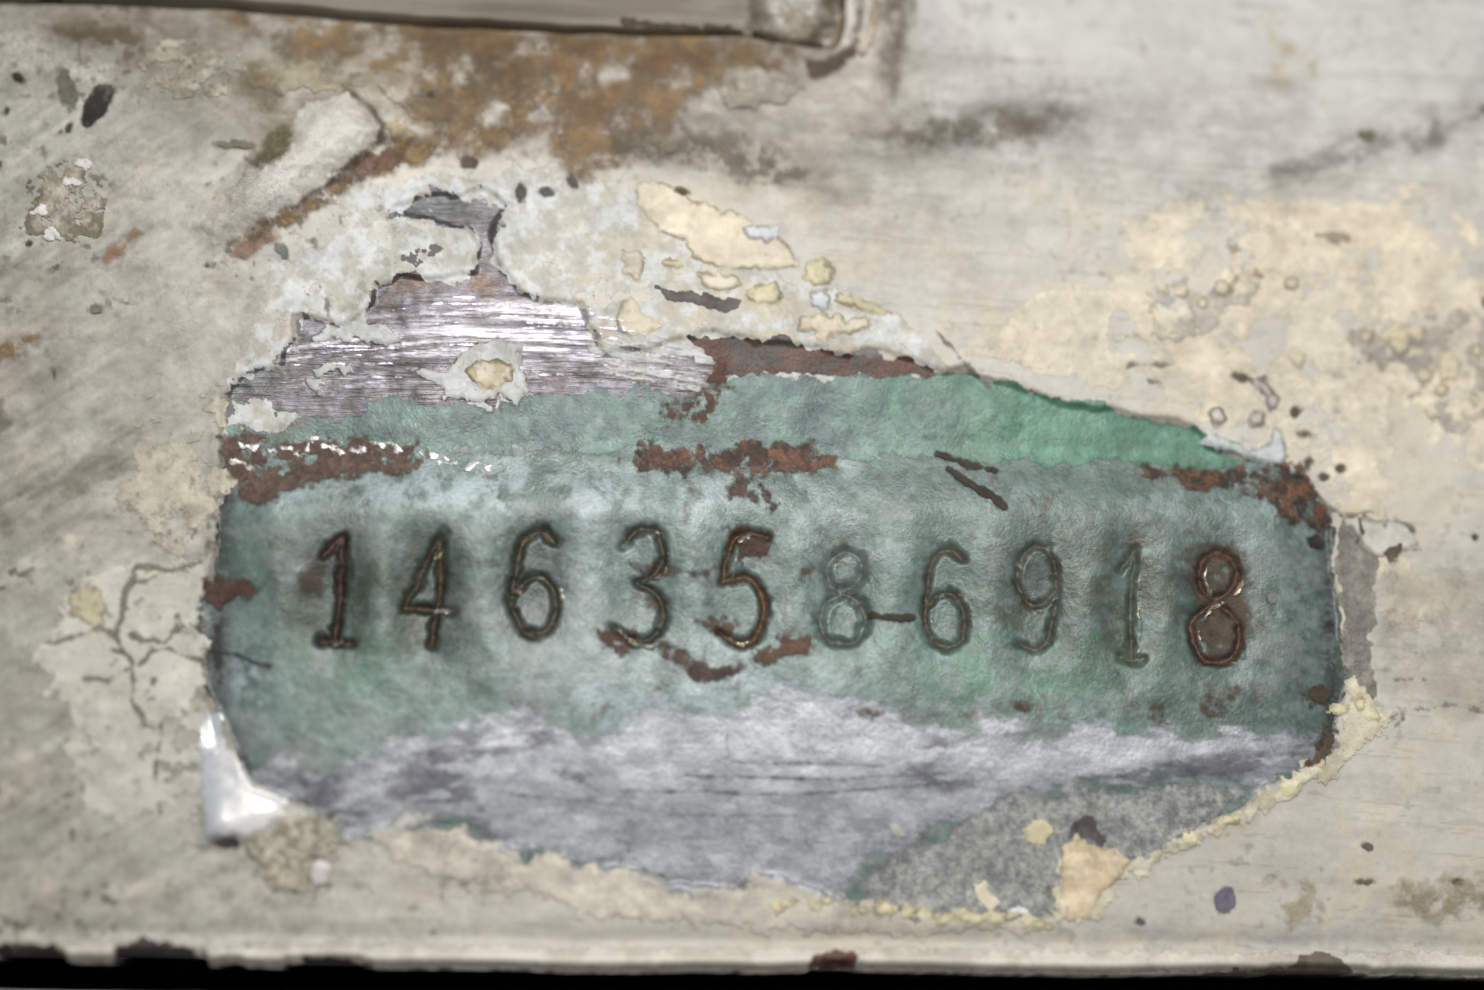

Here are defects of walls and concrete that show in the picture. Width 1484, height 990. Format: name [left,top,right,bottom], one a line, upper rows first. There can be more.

rust [230,7,862,258]
rust [660,357,733,423]
rust [216,430,492,505]
rust [619,438,837,510]
rust [1141,461,1332,532]
peeling [19,156,1484,944]
crack [46,561,207,814]
peeling [114,936,209,969]
peeling [302,955,381,973]
peeling [808,949,858,973]